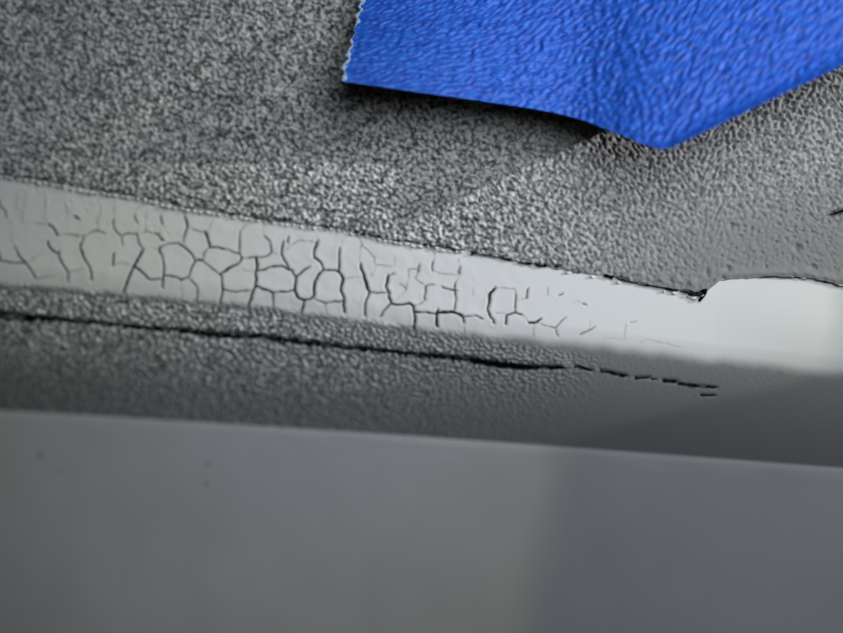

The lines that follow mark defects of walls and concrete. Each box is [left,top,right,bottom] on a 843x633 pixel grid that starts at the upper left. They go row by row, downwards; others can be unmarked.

crack [0,186,716,396]